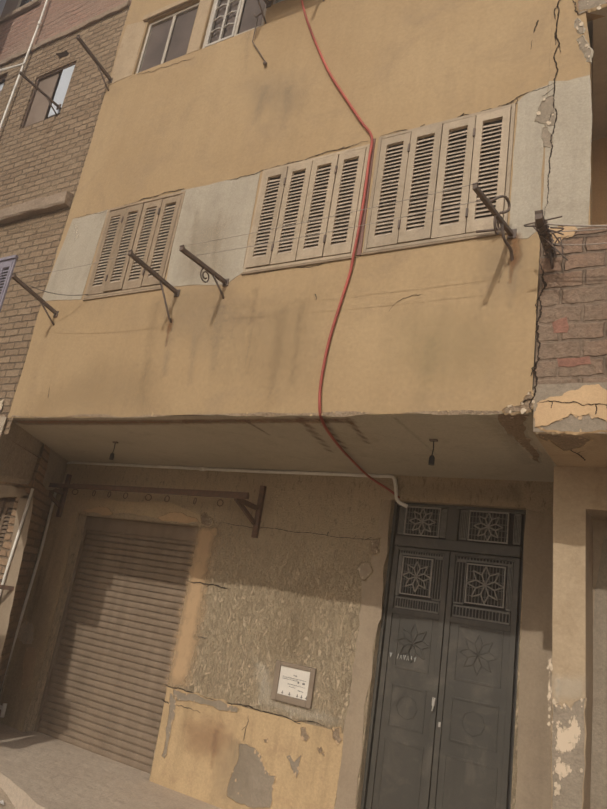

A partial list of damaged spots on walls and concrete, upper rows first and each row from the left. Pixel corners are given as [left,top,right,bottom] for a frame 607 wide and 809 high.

spalling [574,0,607,63]
crack [459,0,578,215]
crack [520,261,607,415]
spalling [405,390,607,463]
crack [162,684,329,740]
peeling [547,659,587,809]
spalling [226,738,276,809]